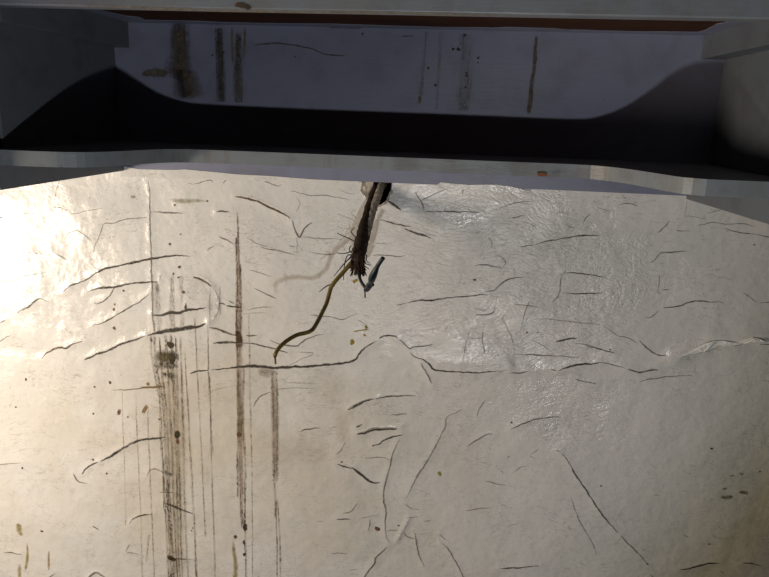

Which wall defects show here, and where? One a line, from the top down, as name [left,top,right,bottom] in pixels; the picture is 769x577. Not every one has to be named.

crack [42,180,691,384]
crack [645,251,723,318]
crack [87,569,108,577]
crack [73,437,164,484]
crack [132,492,193,520]
damp [150,303,190,447]
damp [161,443,215,577]
damp [233,217,253,577]
crack [337,395,485,577]
crack [486,449,653,577]